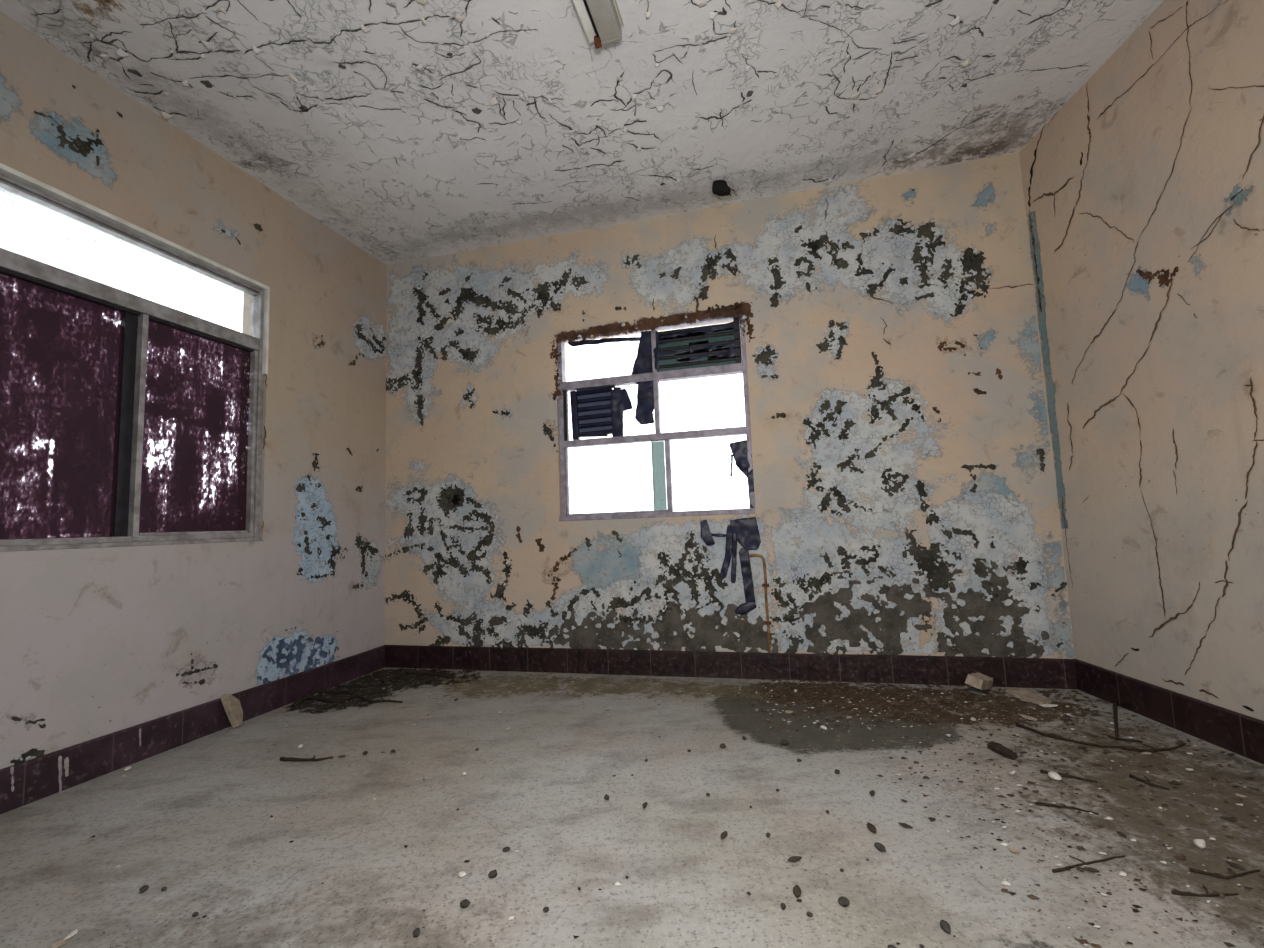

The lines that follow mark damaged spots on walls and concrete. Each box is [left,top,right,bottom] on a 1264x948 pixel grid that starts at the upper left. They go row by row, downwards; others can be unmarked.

peeling [0,75,117,190]
peeling [256,627,339,685]
crack [31,0,1264,711]
peeling [292,182,1075,658]